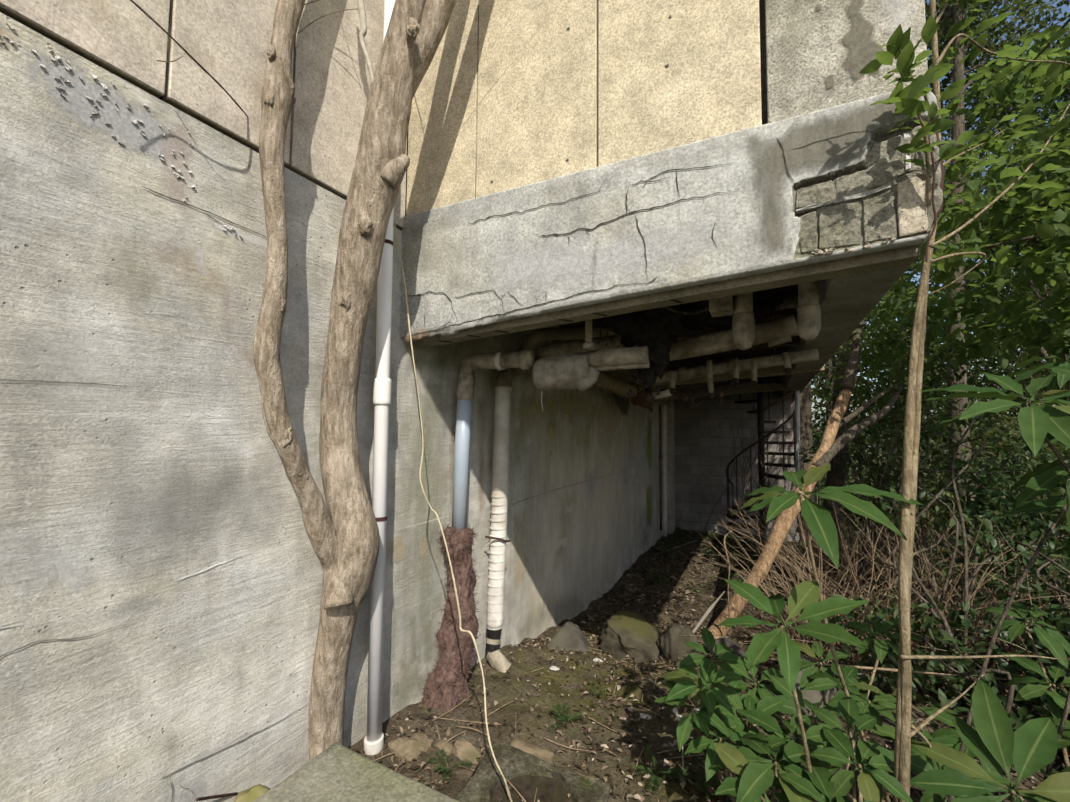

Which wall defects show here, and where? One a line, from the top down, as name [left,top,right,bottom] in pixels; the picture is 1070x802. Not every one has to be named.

leakage [842,0,884,81]
crack [143,186,267,238]
crack [408,162,736,335]
spalling [795,133,932,256]
crack [7,379,132,387]
crack [0,622,132,657]
crack [159,703,309,802]